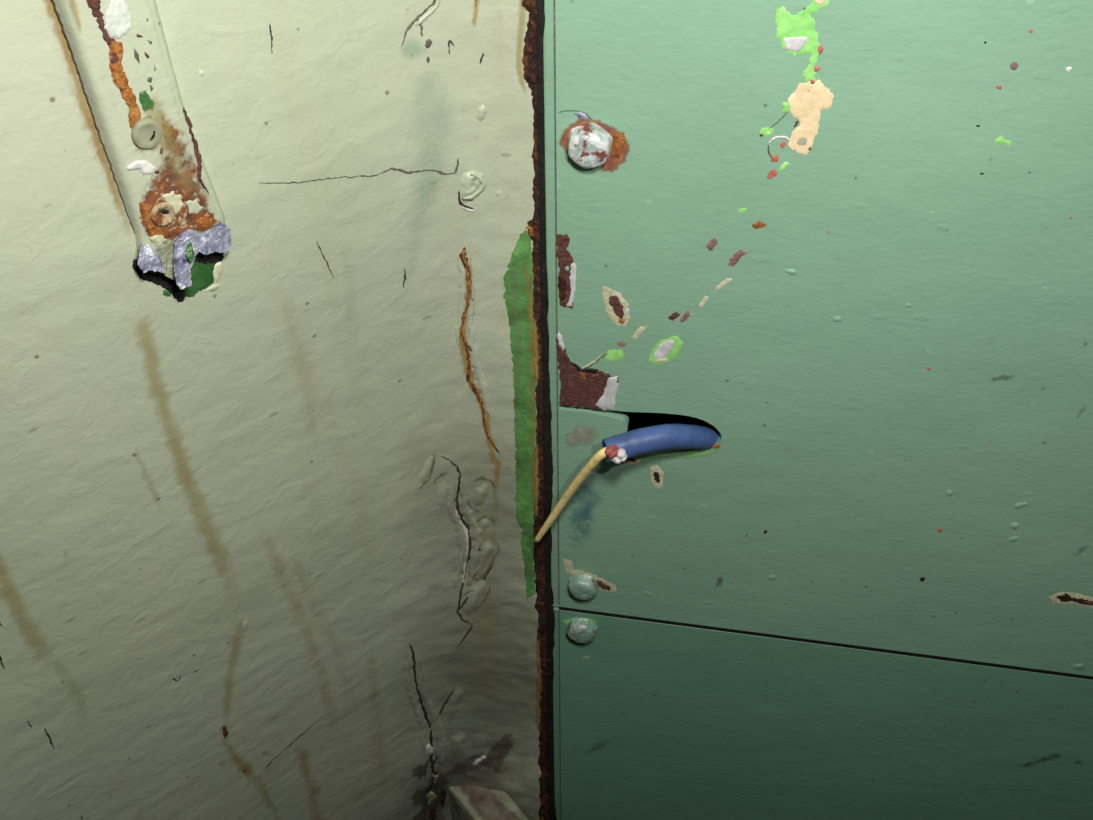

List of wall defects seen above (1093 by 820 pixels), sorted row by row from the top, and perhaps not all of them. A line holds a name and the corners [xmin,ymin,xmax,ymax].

corrosion [47,0,220,241]
crack [261,159,459,184]
peeling [760,0,834,179]
spalling [132,252,224,302]
crack [431,247,500,648]
peeling [503,230,537,598]
peeling [556,234,577,310]
corrosion [517,0,629,820]
peeling [649,336,683,364]
peeling [668,250,750,323]
corrosion [1049,592,1093,608]
crack [403,645,454,781]